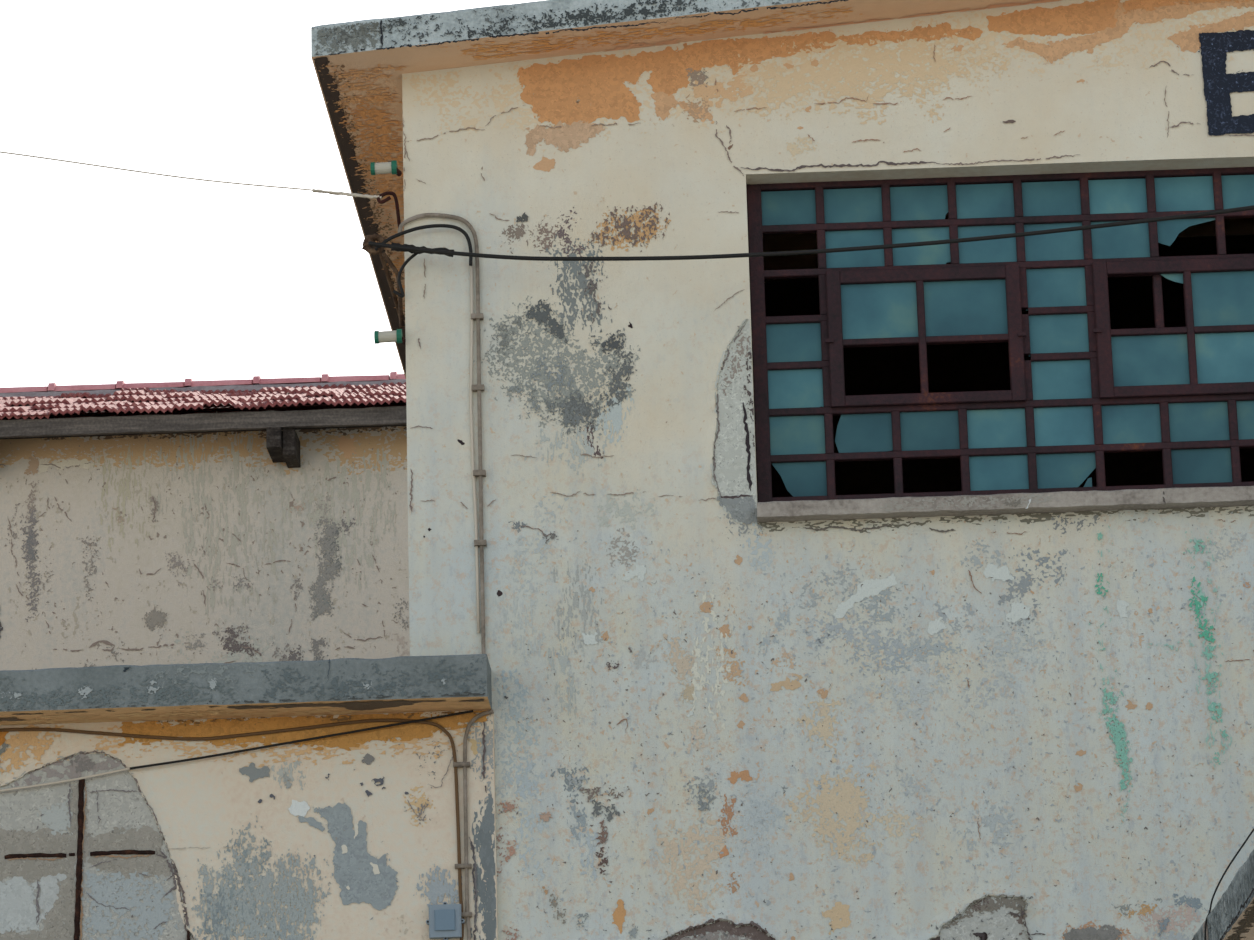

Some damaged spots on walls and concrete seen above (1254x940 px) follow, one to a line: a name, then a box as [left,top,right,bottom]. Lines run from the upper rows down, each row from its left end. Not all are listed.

peeling [517,0,1254,172]
peeling [499,206,671,257]
spalling [710,319,758,526]
rust [80,786,149,940]
crack [28,750,237,939]
spalling [0,710,488,940]
peeling [496,800,519,876]
peeling [542,886,591,931]
peeling [566,775,630,875]
peeling [603,770,803,940]
crack [1010,906,1046,940]
peeling [1057,903,1204,940]